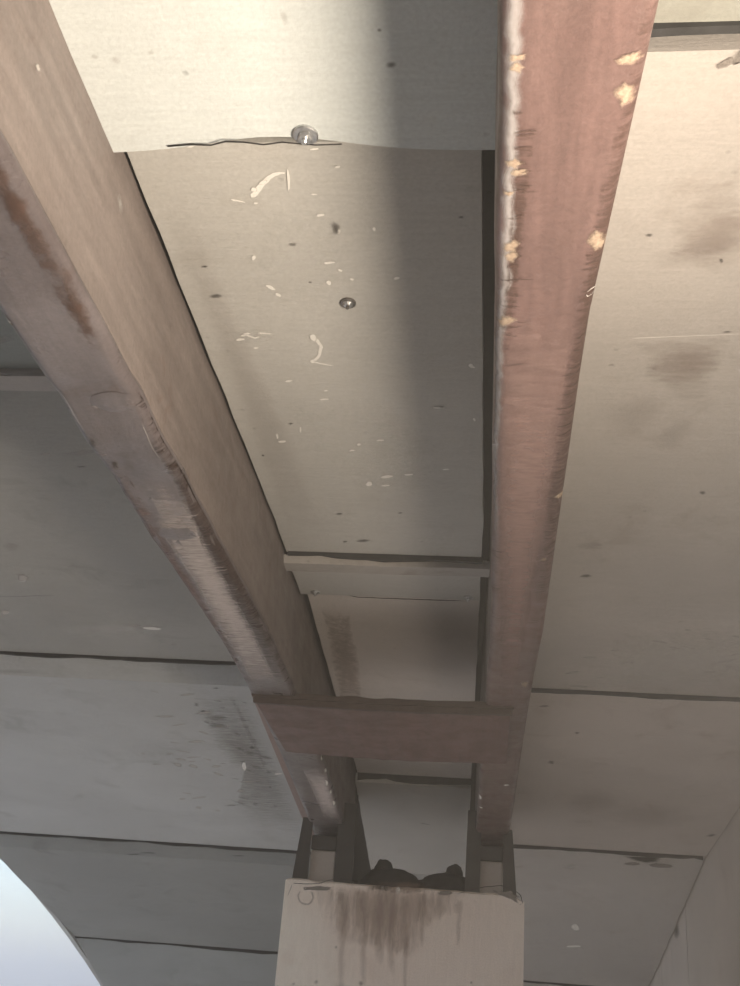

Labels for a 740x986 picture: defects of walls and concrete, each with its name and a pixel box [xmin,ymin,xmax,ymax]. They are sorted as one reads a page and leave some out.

peeling [510,55,524,72]
peeling [617,53,639,64]
peeling [616,84,633,105]
peeling [507,159,526,176]
rust [0,170,54,269]
peeling [588,231,605,250]
peeling [504,240,518,261]